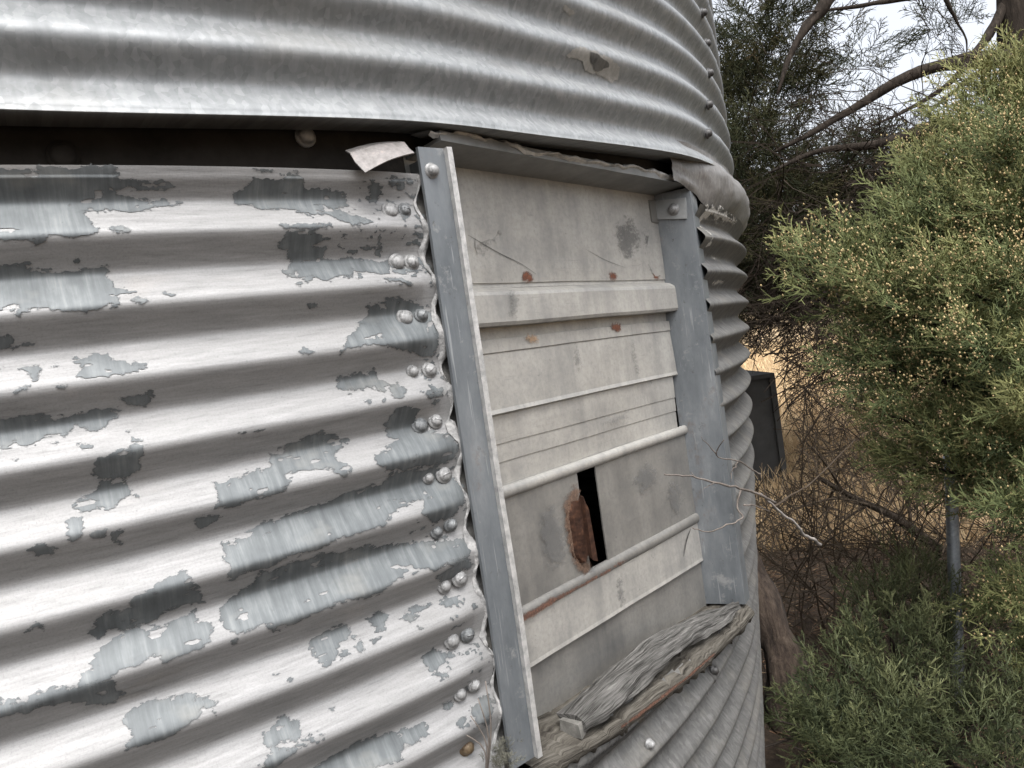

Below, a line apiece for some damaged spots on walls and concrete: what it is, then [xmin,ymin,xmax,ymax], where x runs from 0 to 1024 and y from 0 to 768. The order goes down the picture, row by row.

peeling [566,46,620,83]
damp [619,225,648,257]
peeling [0,164,478,718]
corrosion [523,489,624,621]
peeling [421,643,496,729]
peeling [122,692,219,751]
peeling [258,714,325,768]
peeling [314,722,429,768]